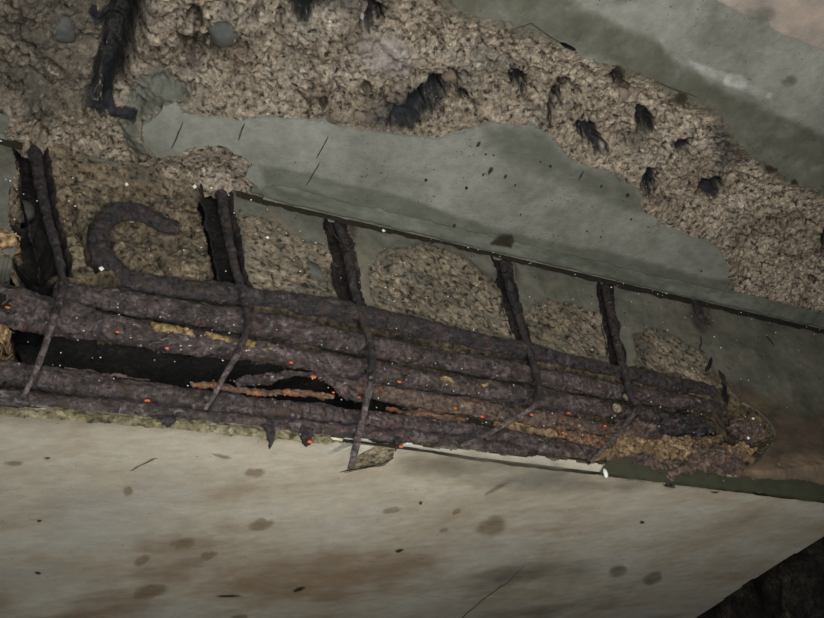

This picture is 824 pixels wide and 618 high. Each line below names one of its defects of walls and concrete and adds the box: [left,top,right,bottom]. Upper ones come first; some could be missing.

spalling [0,0,824,313]
rust [491,235,514,248]
spalling [369,243,516,340]
spalling [0,328,416,415]
spalling [95,299,775,475]
spalling [0,406,302,442]
rust [150,414,176,428]
rust [262,424,276,449]
rust [300,426,314,447]
rust [588,405,766,493]
crack [462,565,525,618]